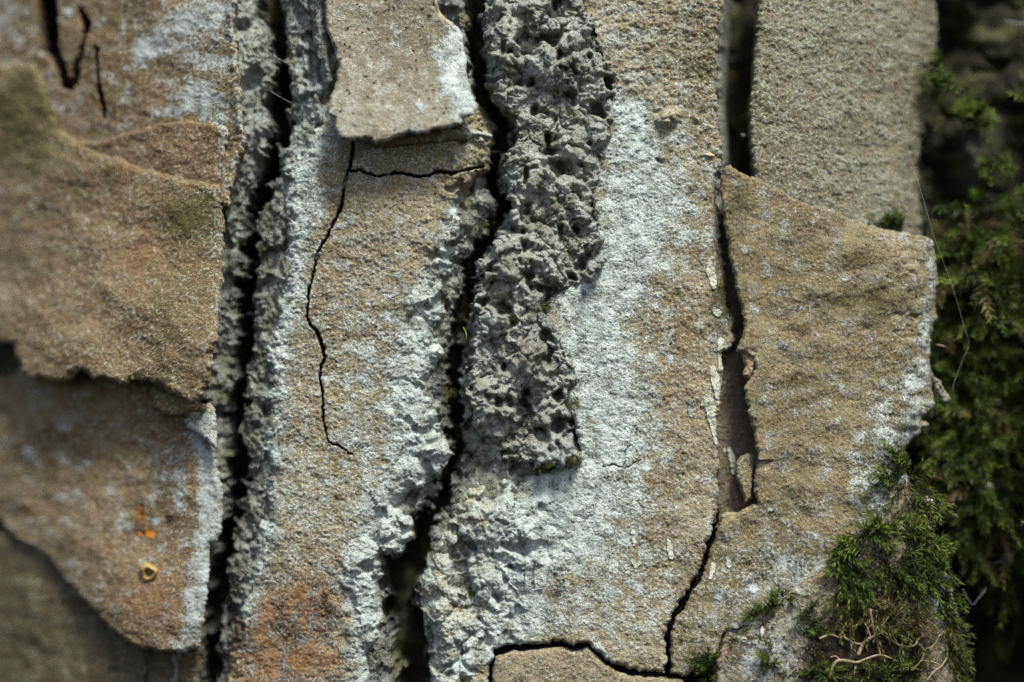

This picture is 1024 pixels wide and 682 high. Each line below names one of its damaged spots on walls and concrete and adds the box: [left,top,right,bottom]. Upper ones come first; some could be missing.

crack [43,0,81,91]
crack [590,14,608,98]
crack [714,0,733,217]
crack [170,0,582,682]
crack [494,511,720,678]